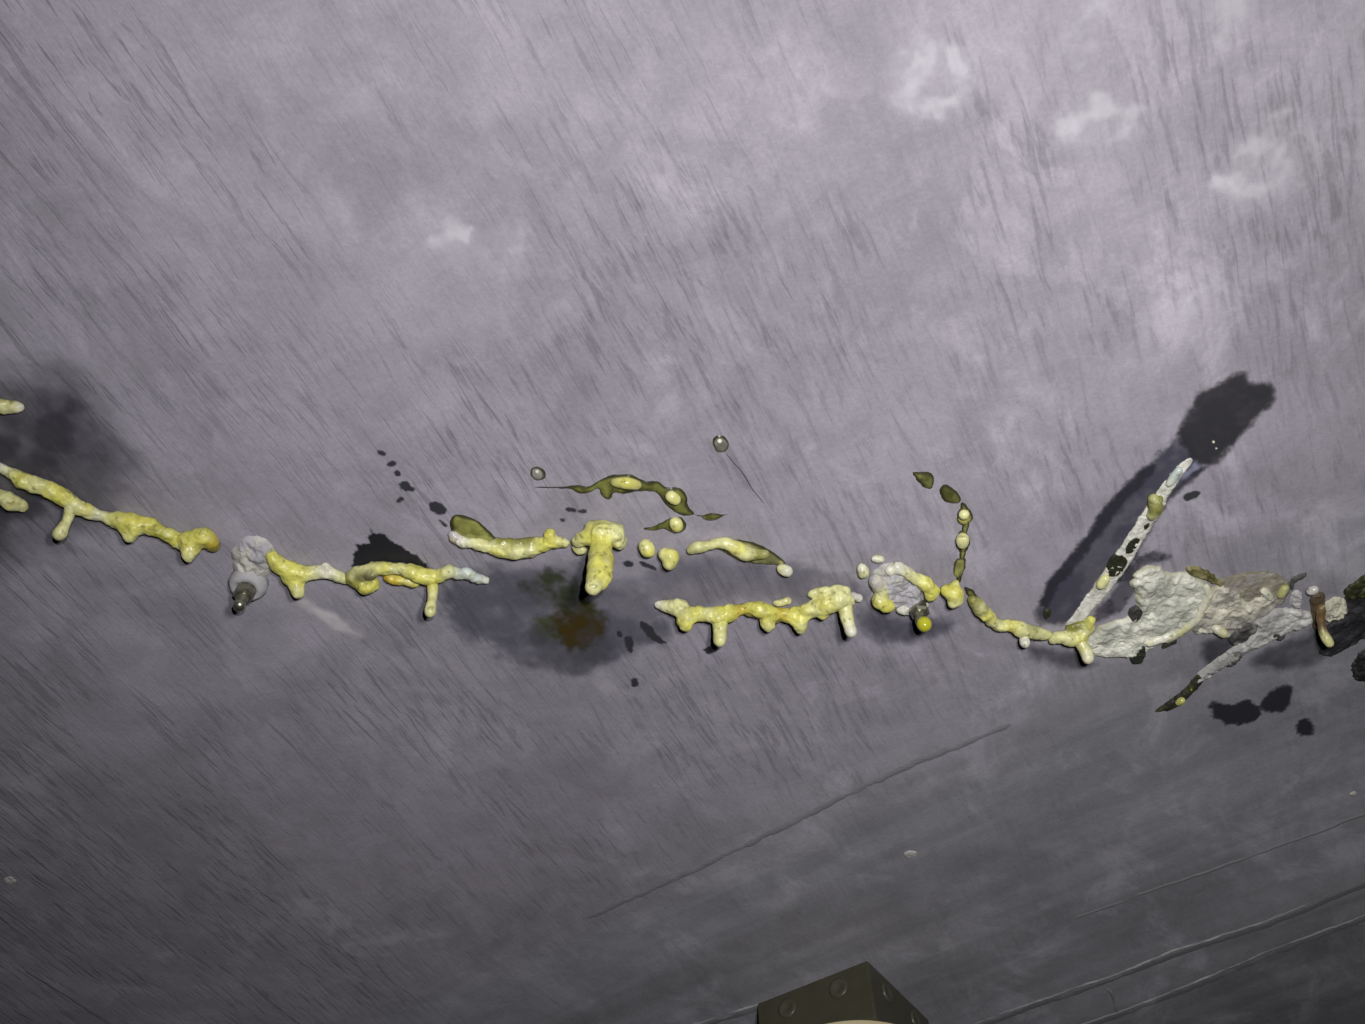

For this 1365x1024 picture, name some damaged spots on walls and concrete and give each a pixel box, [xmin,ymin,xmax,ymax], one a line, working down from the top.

damp [0,397,111,505]
crack [727,455,764,503]
damp [0,489,44,528]
damp [1033,373,1325,712]
damp [447,573,542,646]
corrosion [539,569,605,649]
damp [574,613,666,660]
damp [1209,685,1292,725]
damp [1296,718,1313,735]